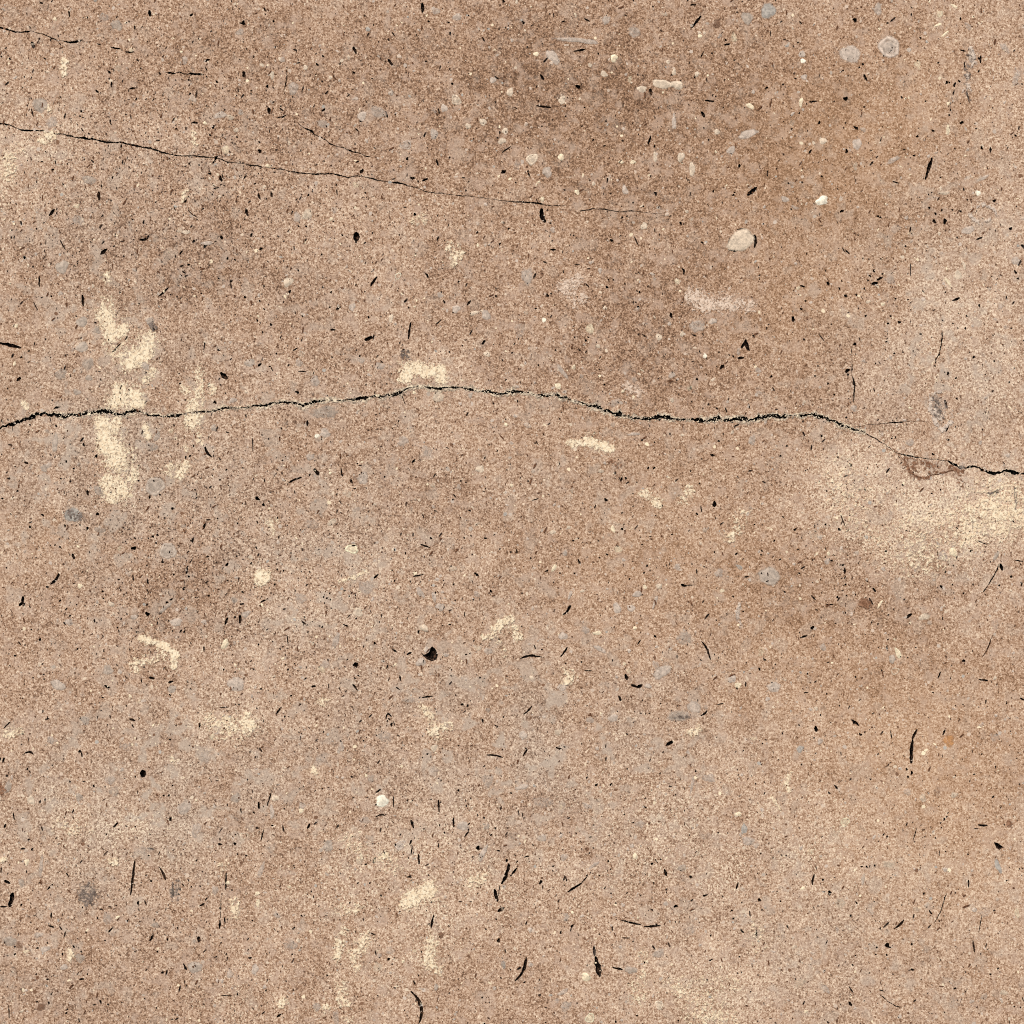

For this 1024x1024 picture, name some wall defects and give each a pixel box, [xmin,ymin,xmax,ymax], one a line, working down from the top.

crack [0,67,662,214]
crack [0,349,1024,479]